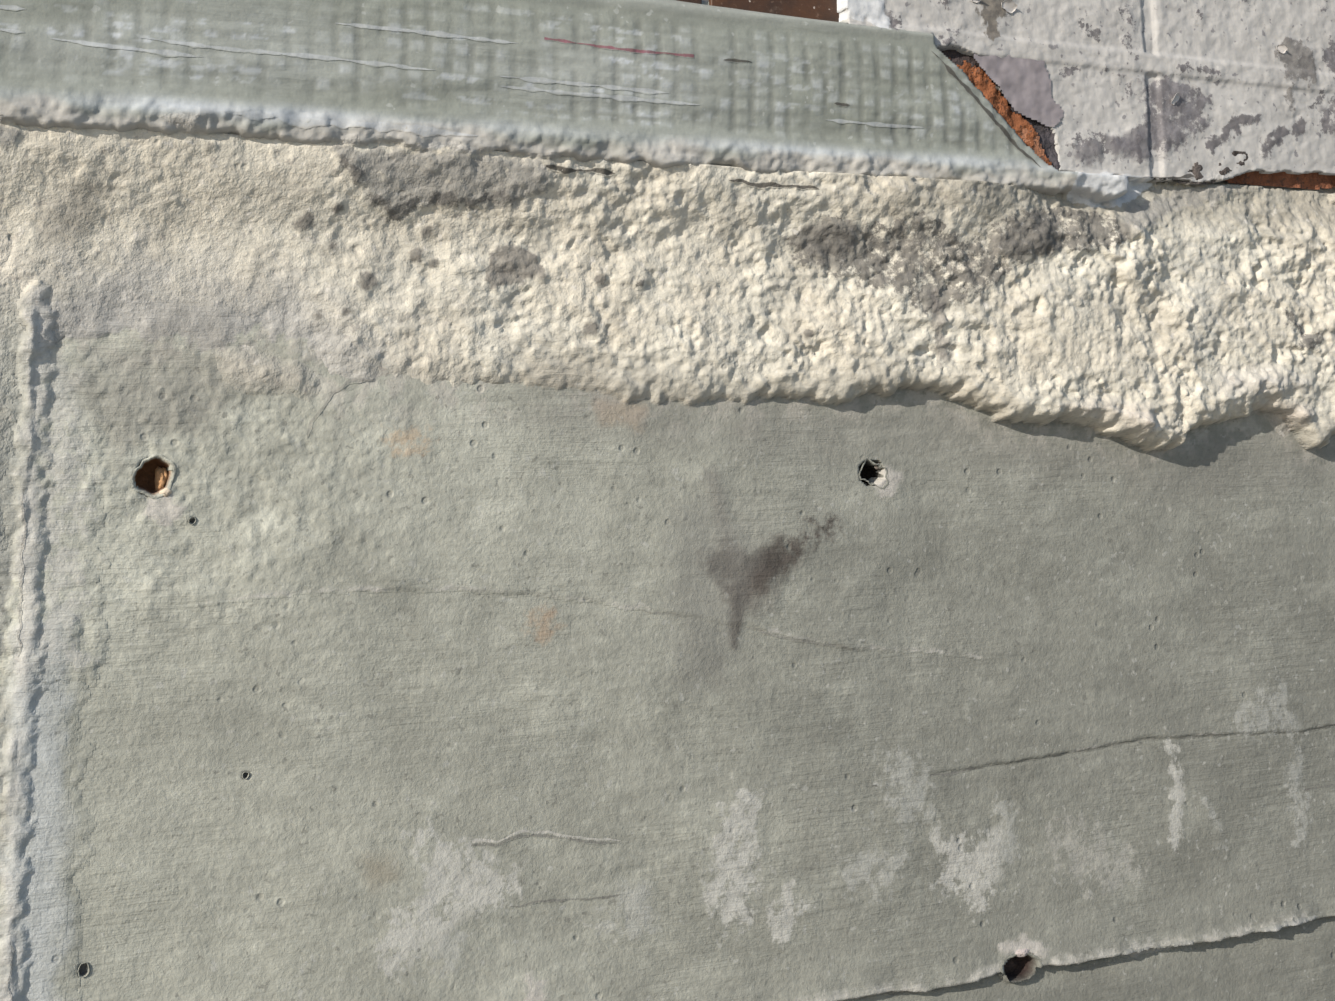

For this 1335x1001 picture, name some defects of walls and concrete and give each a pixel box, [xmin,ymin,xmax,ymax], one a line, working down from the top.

spalling [0,0,1335,430]
damp [499,170,1335,710]
damp [363,809,532,1001]
crack [453,829,621,848]
crack [510,894,621,908]
damp [581,868,668,953]
damp [692,716,1232,972]
crack [930,718,1335,777]
damp [1222,666,1320,861]